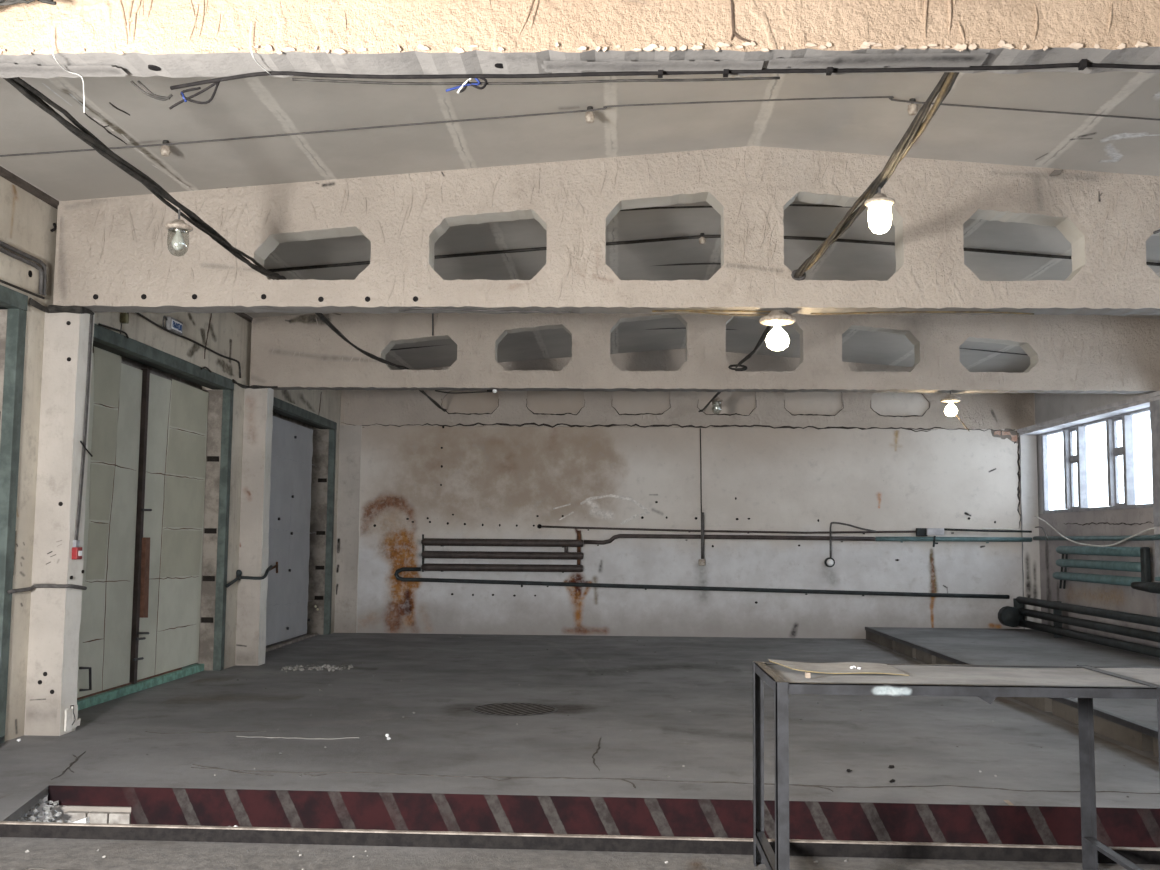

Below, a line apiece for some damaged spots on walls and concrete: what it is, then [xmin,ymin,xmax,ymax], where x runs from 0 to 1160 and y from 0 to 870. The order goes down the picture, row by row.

crack [730,0,751,42]
rust [357,489,436,633]
rust [559,572,612,635]
rust [927,547,940,628]